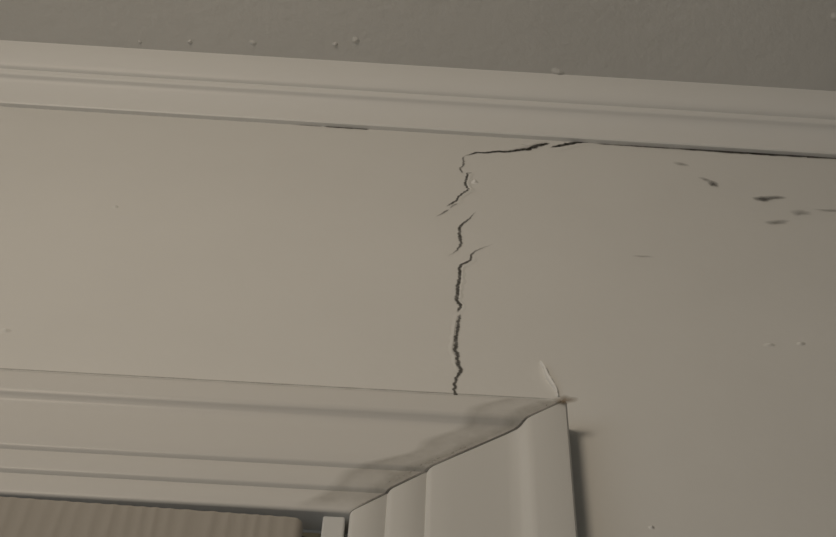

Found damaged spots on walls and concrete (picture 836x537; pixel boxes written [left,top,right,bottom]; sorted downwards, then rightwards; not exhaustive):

crack [408,140,836,395]